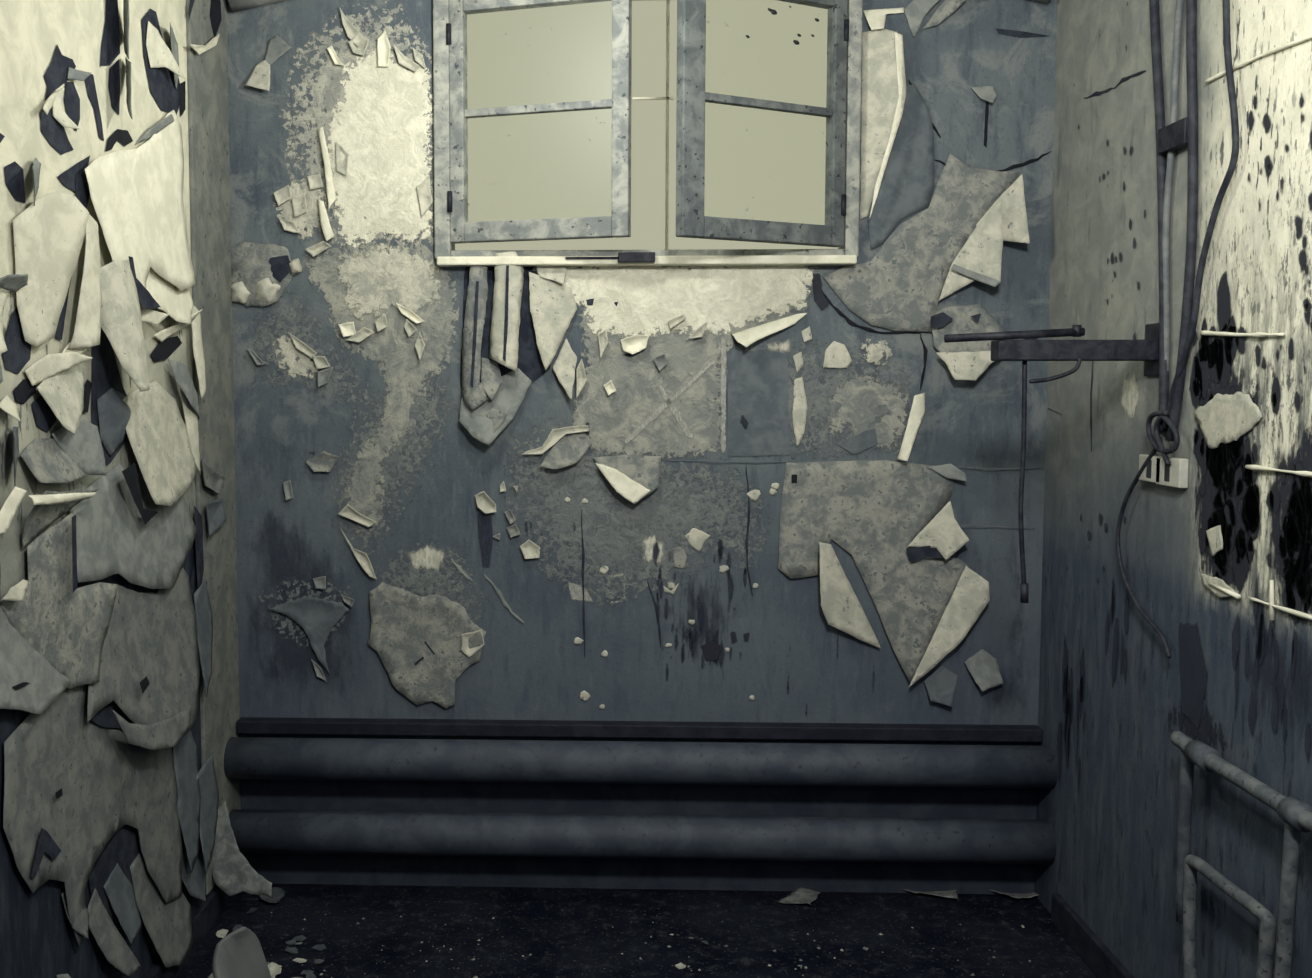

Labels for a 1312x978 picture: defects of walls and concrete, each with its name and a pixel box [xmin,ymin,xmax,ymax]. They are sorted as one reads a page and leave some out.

water stain [1248,95,1289,211]
water stain [1107,210,1146,278]
water stain [1295,192,1312,332]
flaking render [231,0,1038,709]
flaking render [1122,375,1140,417]
flaking render [1194,392,1262,449]
peeling [0,0,226,977]
flaking render [1206,525,1223,556]
flaking render [1201,573,1237,598]
water stain [1189,271,1312,762]
water stain [1058,639,1085,792]
water stain [1168,623,1225,751]